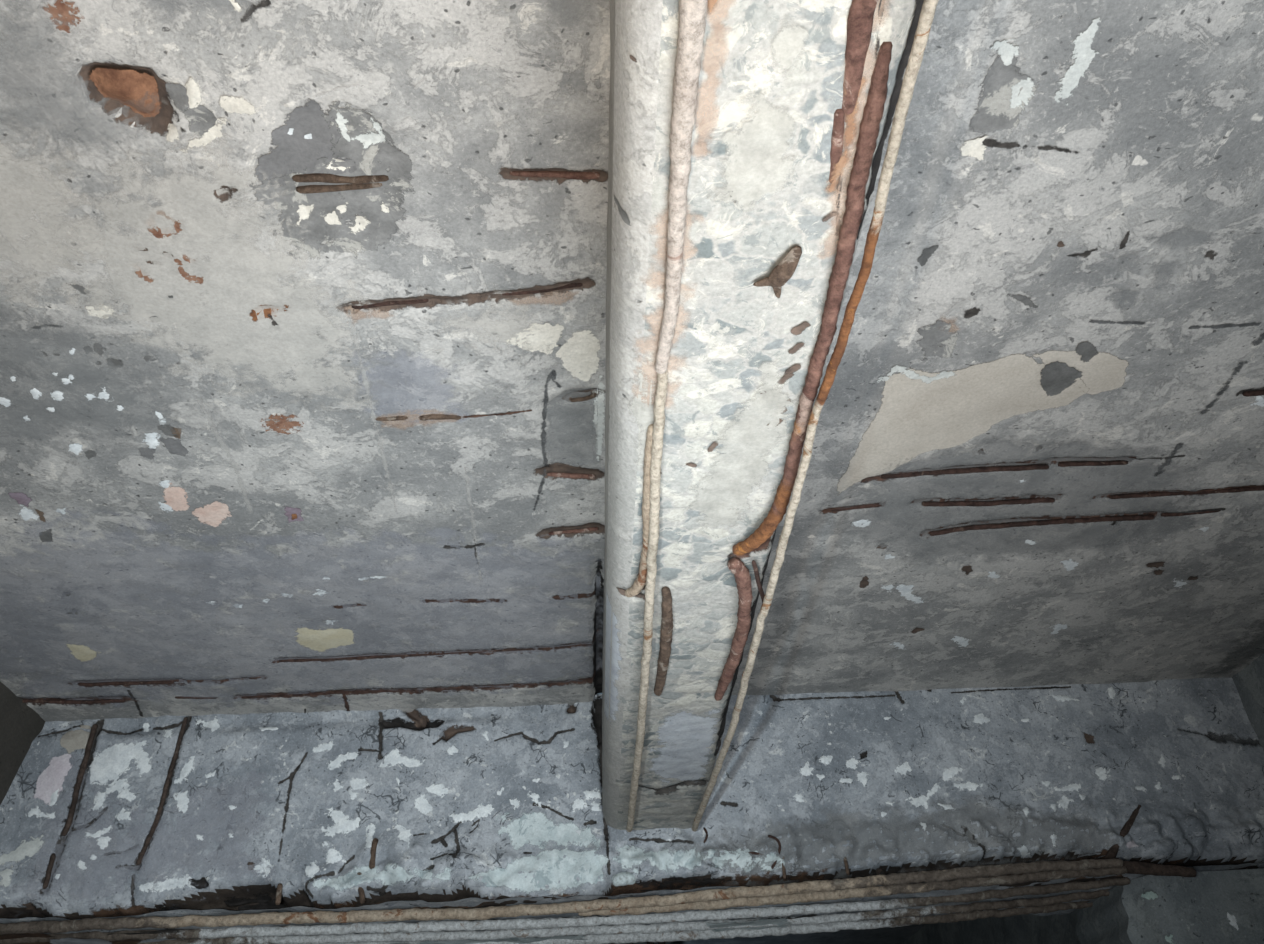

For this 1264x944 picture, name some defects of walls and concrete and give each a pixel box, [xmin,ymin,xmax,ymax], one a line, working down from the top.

peeling [1054,17,1101,106]
corrosion [826,78,865,192]
crack [835,0,924,240]
spalling [964,308,981,319]
crack [1089,318,1145,326]
crack [1189,322,1264,414]
peeling [831,319,1129,528]
crack [822,443,1264,538]
spalling [929,510,1221,545]
spalling [1109,487,1264,499]
crack [638,530,776,807]
spalling [0,675,1197,944]